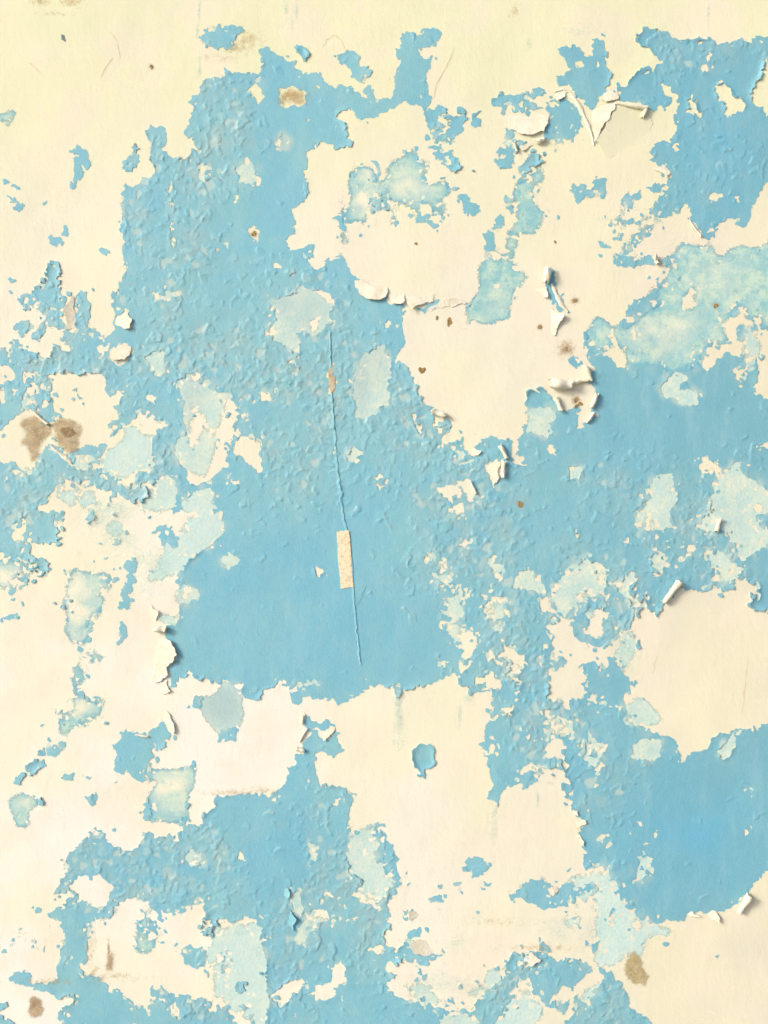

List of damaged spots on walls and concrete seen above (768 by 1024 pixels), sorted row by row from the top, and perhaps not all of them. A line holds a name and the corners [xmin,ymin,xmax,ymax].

peeling [199,24,244,50]
peeling [294,45,310,62]
peeling [333,50,372,83]
damp [279,91,303,104]
peeling [48,225,69,247]
peeling [617,263,670,330]
peeling [13,320,33,338]
crack [328,331,367,665]
peeling [151,524,189,549]
peeling [93,530,154,646]
peeling [13,724,66,785]
peeling [112,711,177,783]